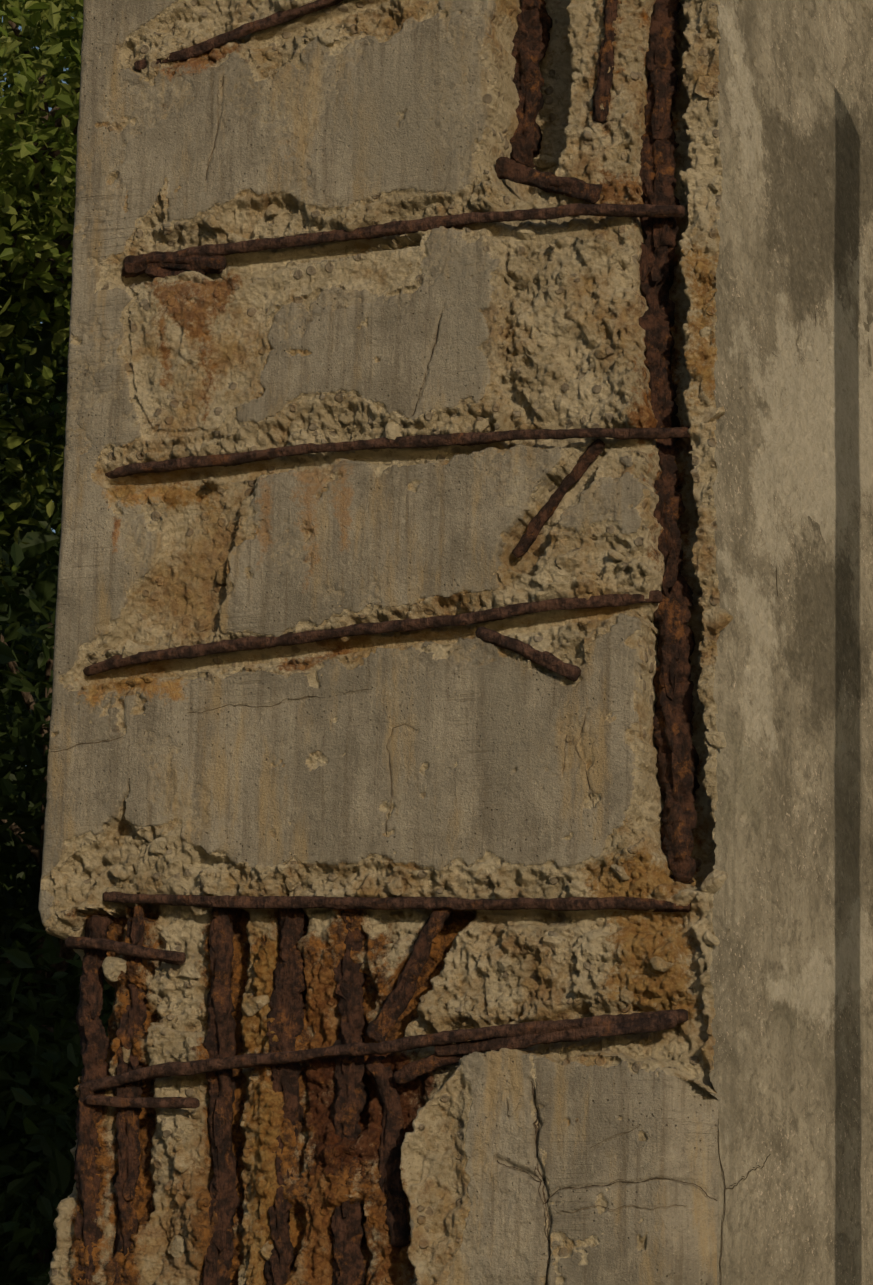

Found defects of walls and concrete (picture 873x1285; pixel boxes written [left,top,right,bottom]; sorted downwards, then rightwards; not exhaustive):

corrosion [88,472,233,561]
corrosion [124,251,249,430]
spalling [76,0,733,1094]
corrosion [475,626,582,682]
corrosion [512,439,605,558]
corrosion [495,156,645,228]
corrosion [674,184,720,463]
damp [715,0,873,778]
spalling [45,783,641,1285]
corrosion [143,838,711,1285]
crack [497,1081,770,1285]
damp [761,750,873,1054]